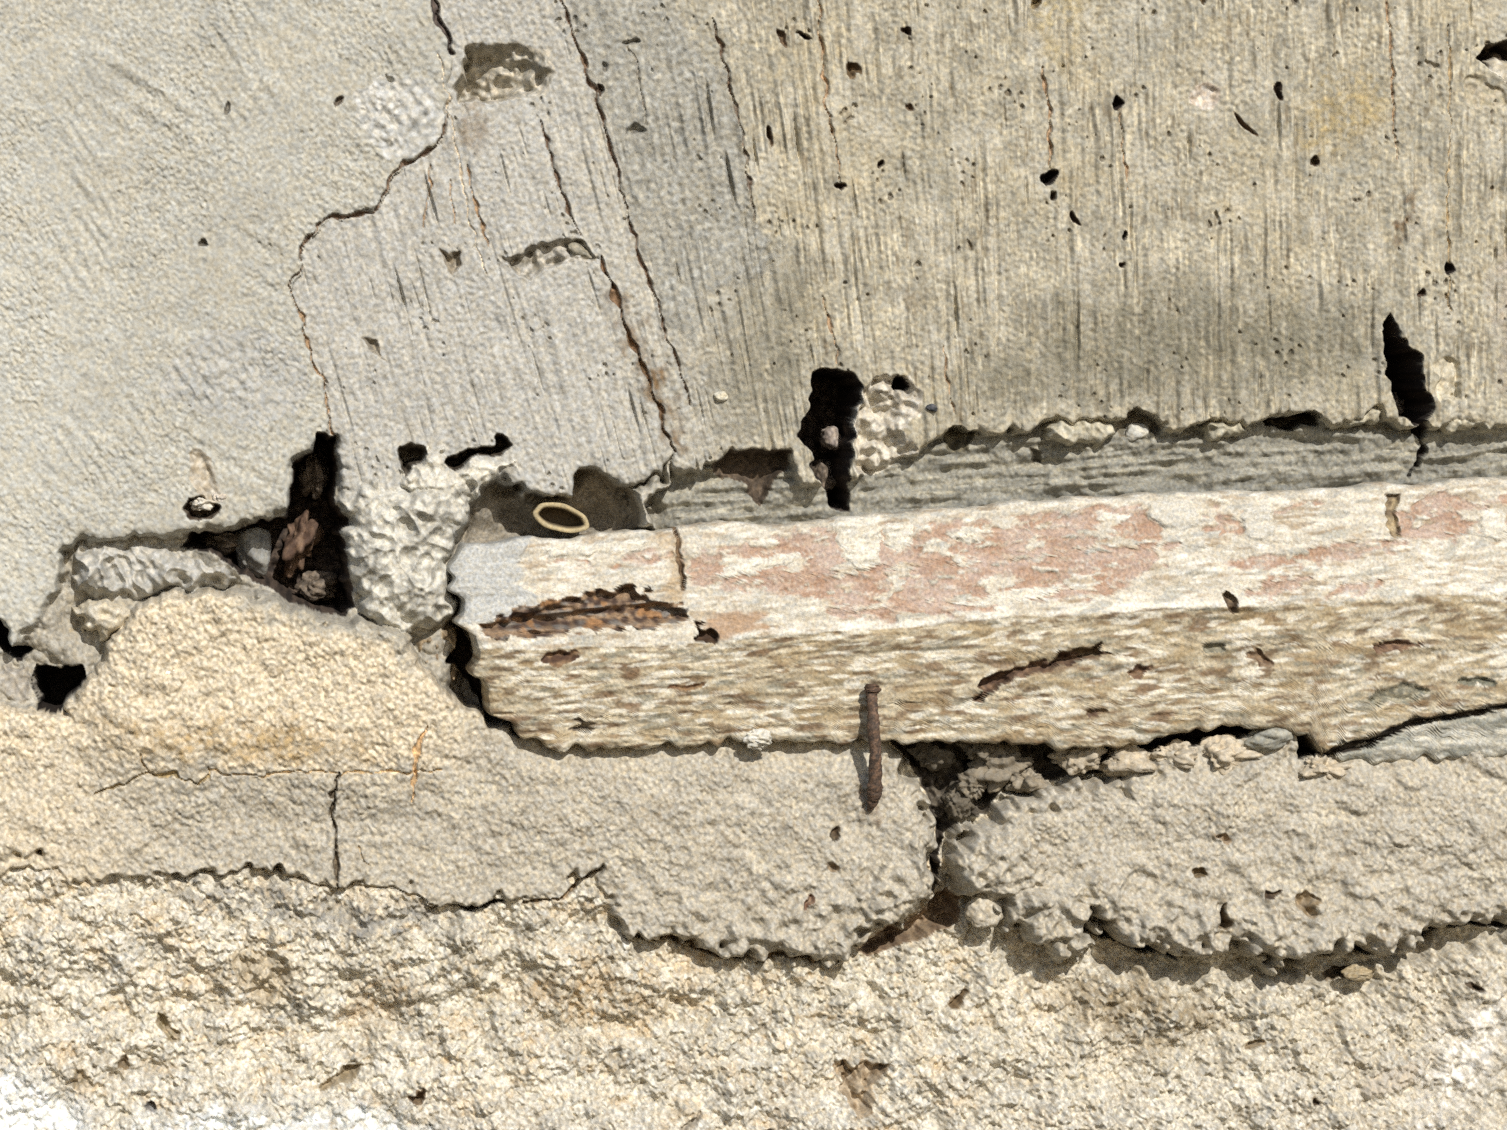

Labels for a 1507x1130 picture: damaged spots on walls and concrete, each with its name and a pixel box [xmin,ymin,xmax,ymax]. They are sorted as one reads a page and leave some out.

spalling [353,42,558,161]
crack [289,0,490,436]
spalling [501,238,596,282]
crack [541,0,691,453]
spalling [180,433,356,617]
spalling [397,442,428,478]
spalling [445,434,513,472]
spalling [712,369,924,572]
crack [1407,422,1430,477]
hole [0,619,87,715]
hole [445,627,490,717]
crack [96,726,597,913]